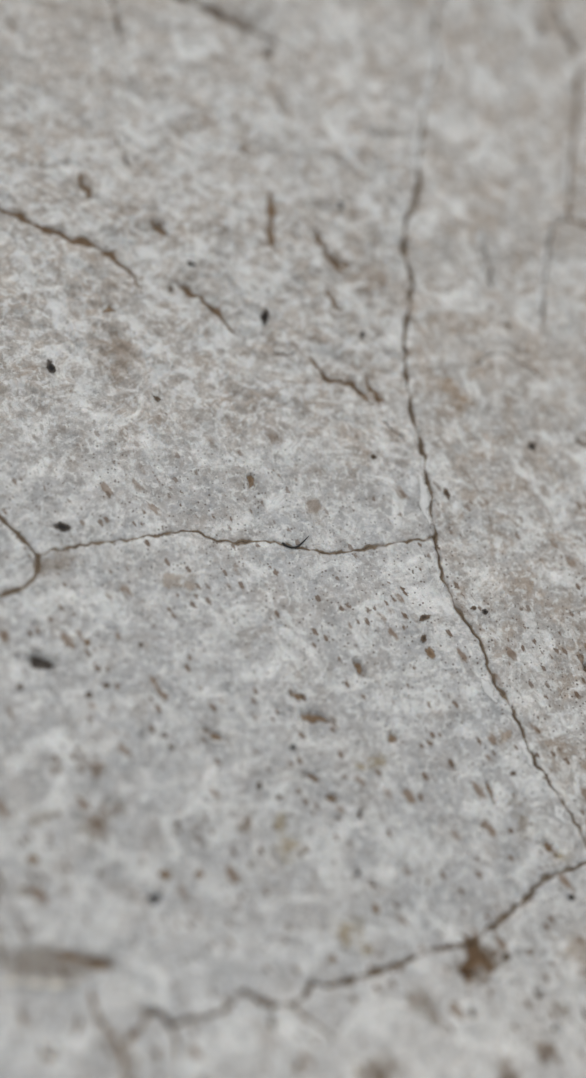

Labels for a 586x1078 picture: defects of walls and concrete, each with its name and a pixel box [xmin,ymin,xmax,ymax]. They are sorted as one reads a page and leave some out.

crack [177,0,274,43]
crack [0,7,586,845]
crack [89,862,586,1078]